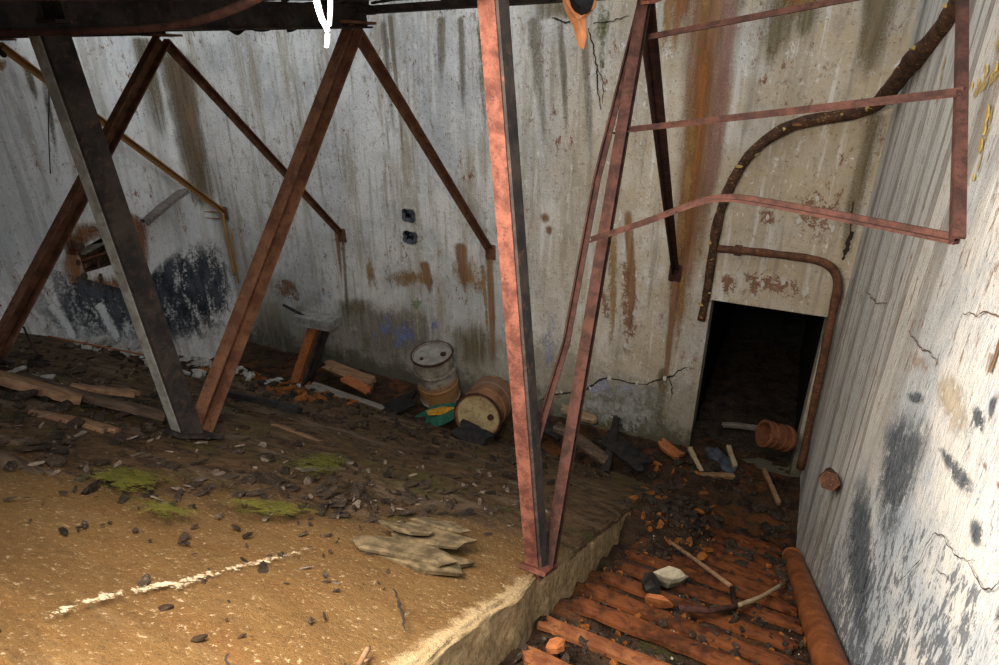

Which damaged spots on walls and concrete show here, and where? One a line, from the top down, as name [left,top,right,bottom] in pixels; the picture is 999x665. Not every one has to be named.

water stain [437,17,445,65]
water stain [146,52,213,199]
corrosion [663,0,736,381]
spalling [64,224,120,292]
water stain [48,275,138,342]
water stain [151,250,228,340]
corrosion [394,262,436,291]
corrosion [453,244,495,353]
peeling [721,270,808,298]
crack [540,367,687,401]
crack [899,532,999,590]
peeling [970,520,981,544]